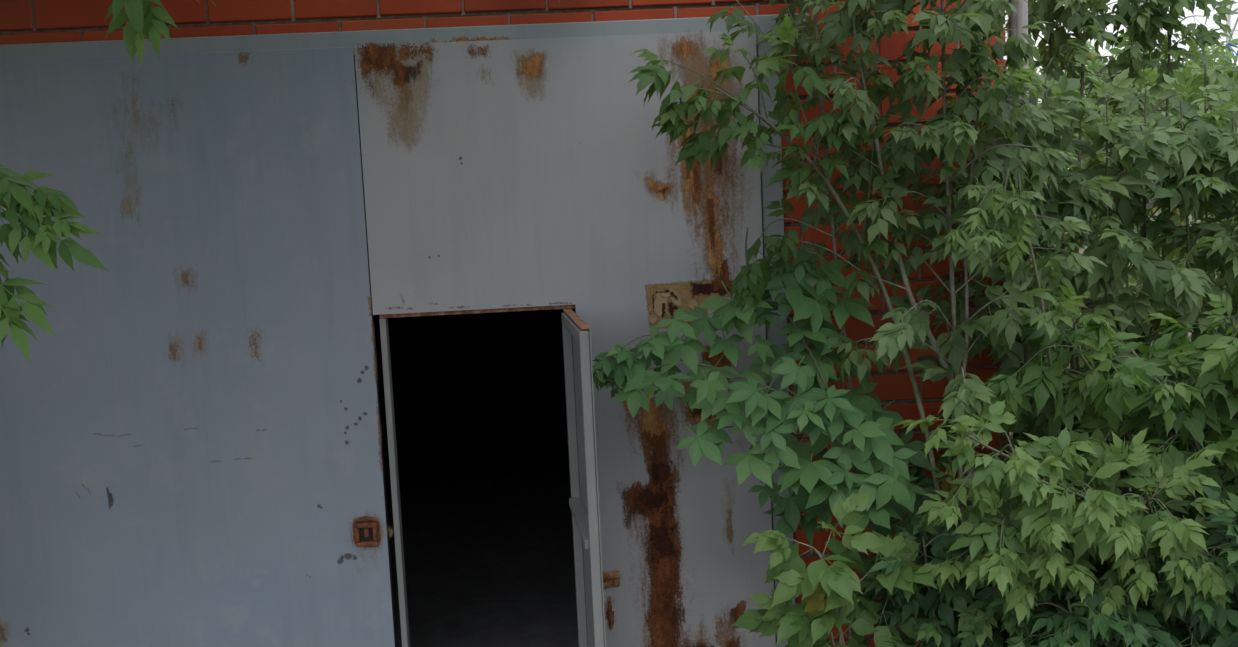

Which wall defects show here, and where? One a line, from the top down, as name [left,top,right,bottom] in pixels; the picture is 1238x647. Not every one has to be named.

rust [357,36,525,95]
rust [517,52,544,79]
rust [645,37,742,283]
rust [621,345,746,647]